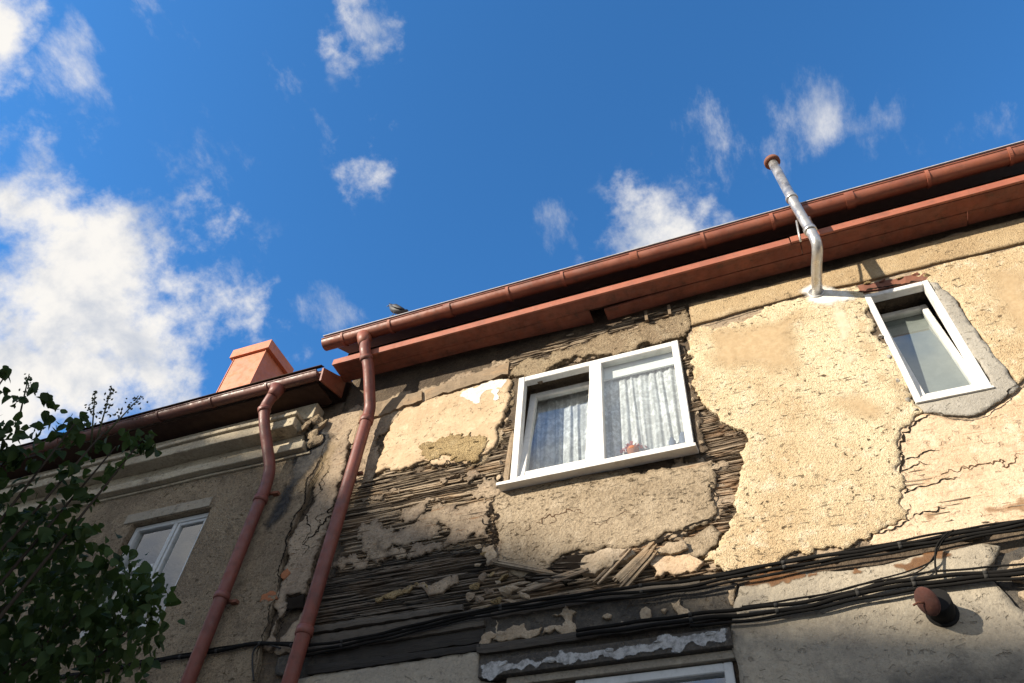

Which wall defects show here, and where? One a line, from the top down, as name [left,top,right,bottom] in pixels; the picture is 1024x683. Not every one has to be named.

crack [256,445,336,660]
spalling [297,414,327,449]
spalling [310,304,748,644]
crack [844,381,1023,549]
peeling [481,628,727,681]